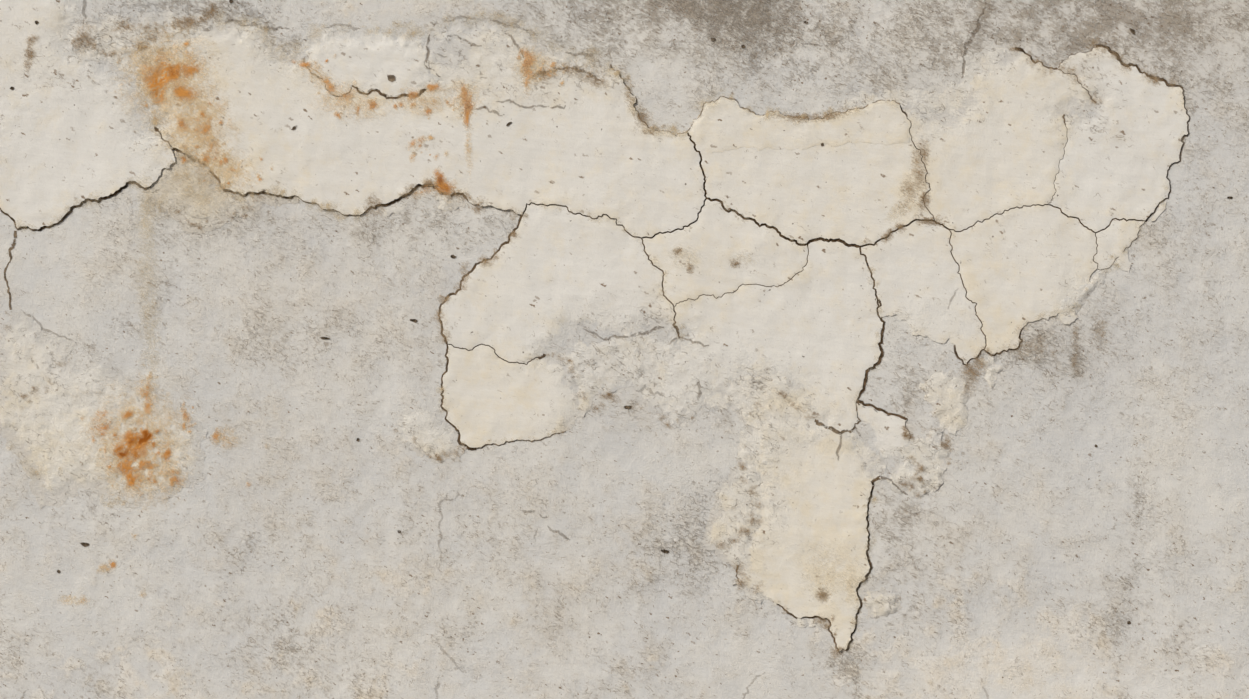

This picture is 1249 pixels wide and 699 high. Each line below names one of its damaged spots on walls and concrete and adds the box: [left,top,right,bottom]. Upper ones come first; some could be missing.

crack [0,181,151,310]
rust [134,42,240,187]
crack [151,119,482,216]
rust [323,79,376,117]
crack [303,58,426,99]
rust [394,84,472,151]
rust [435,172,451,194]
peeling [0,0,1189,509]
crack [436,41,1190,450]
rust [93,386,191,491]
peeling [700,374,881,651]
crack [736,476,881,654]